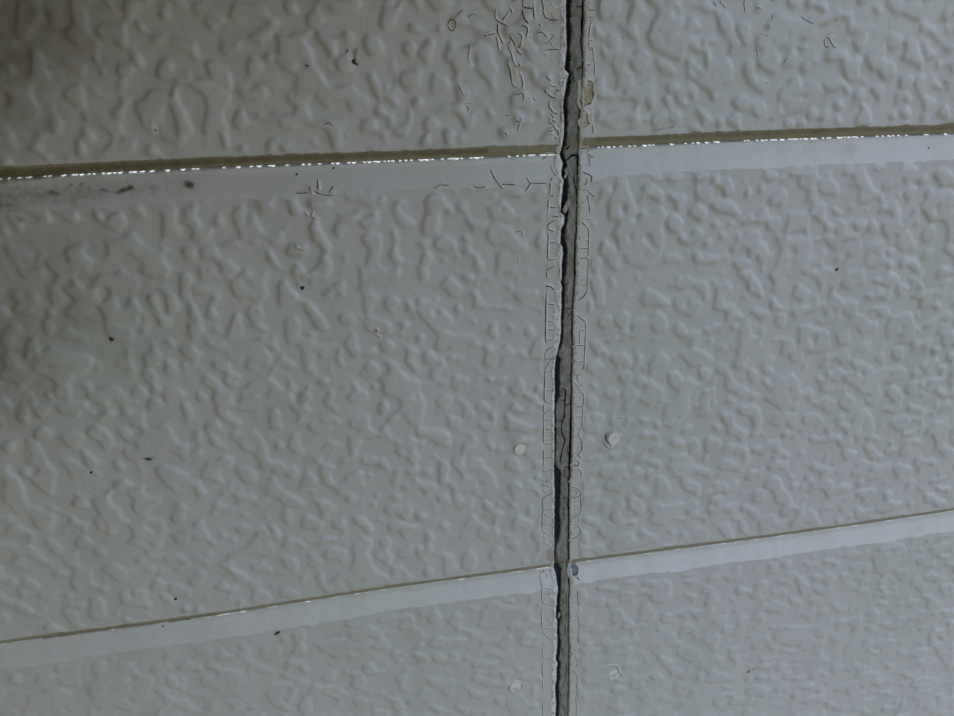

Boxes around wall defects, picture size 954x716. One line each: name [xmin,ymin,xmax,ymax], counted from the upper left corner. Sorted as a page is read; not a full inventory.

crack [448,0,616,716]
peeling [549,0,597,716]